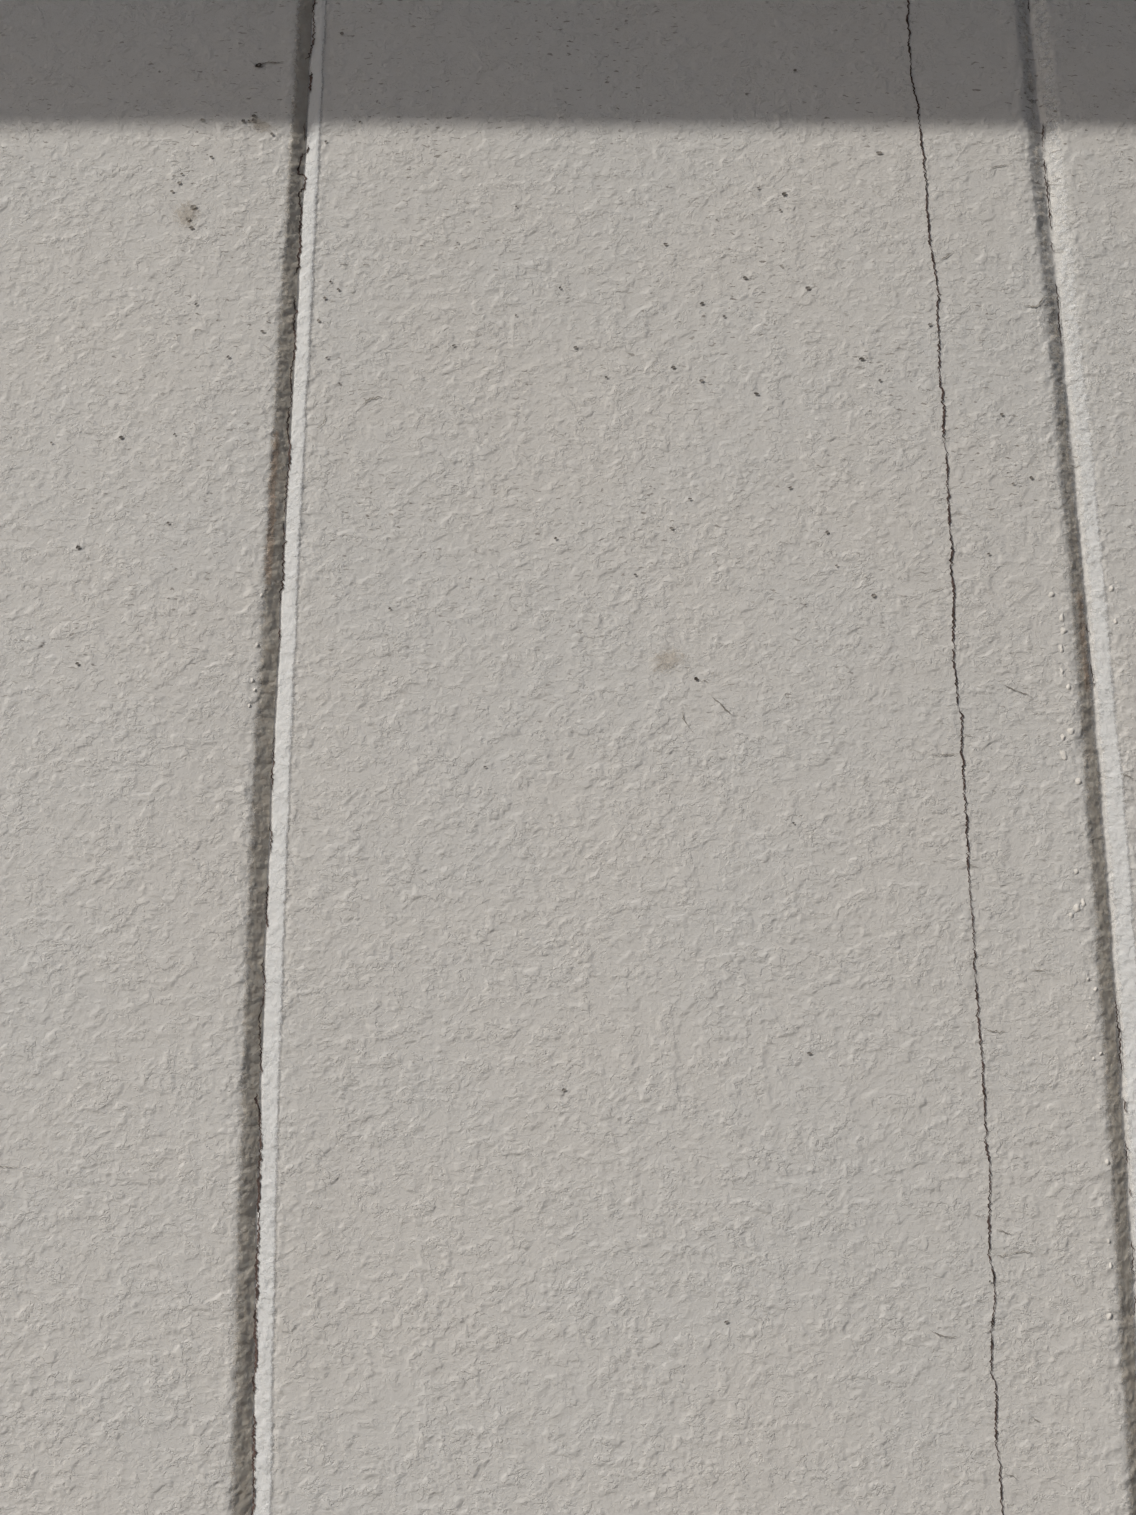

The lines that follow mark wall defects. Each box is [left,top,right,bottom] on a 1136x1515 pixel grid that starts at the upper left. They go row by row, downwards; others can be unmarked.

crack [906,0,1032,1515]